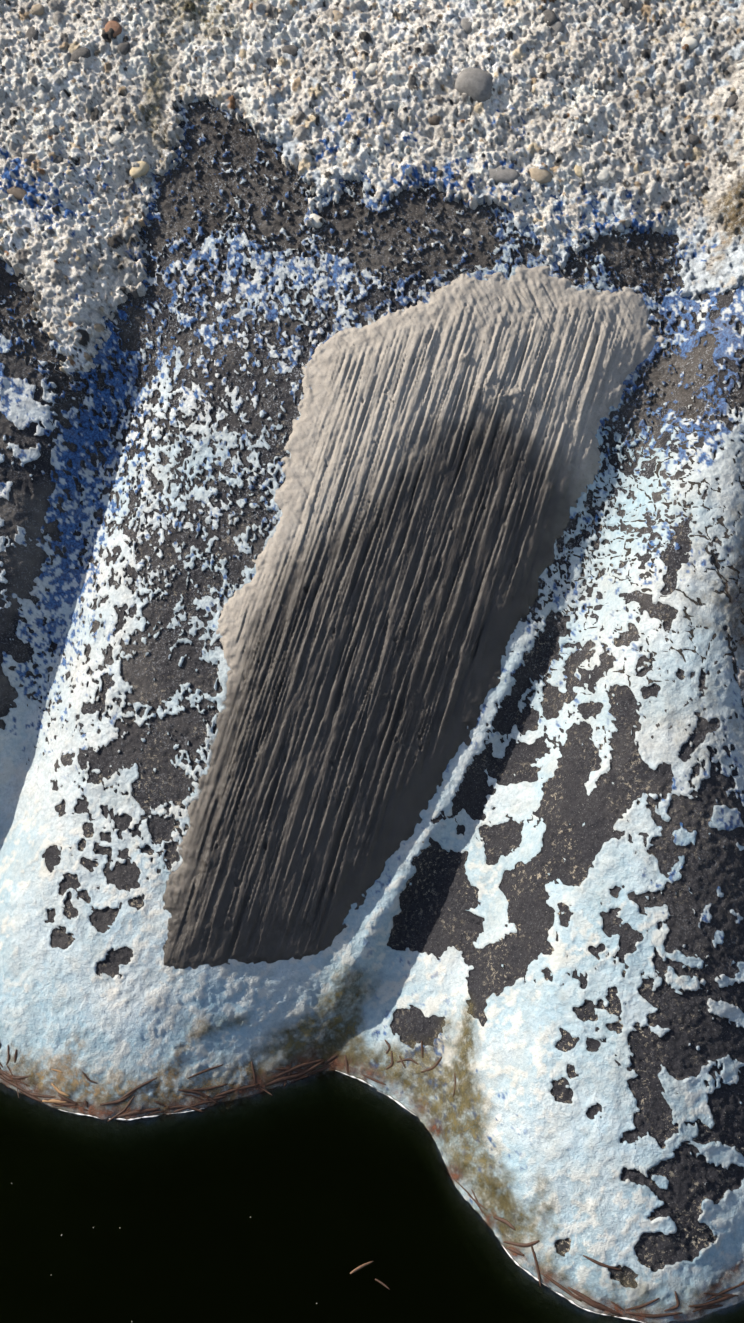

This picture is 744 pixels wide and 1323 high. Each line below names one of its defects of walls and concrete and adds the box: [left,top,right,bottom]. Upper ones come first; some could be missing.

peeling [0,99,548,949]
peeling [387,225,744,1272]
peeling [96,946,133,978]
water stain [1,1044,215,1121]
water stain [330,1058,425,1116]
water stain [446,1007,471,1110]
water stain [503,1246,646,1323]
peeling [608,1265,638,1288]